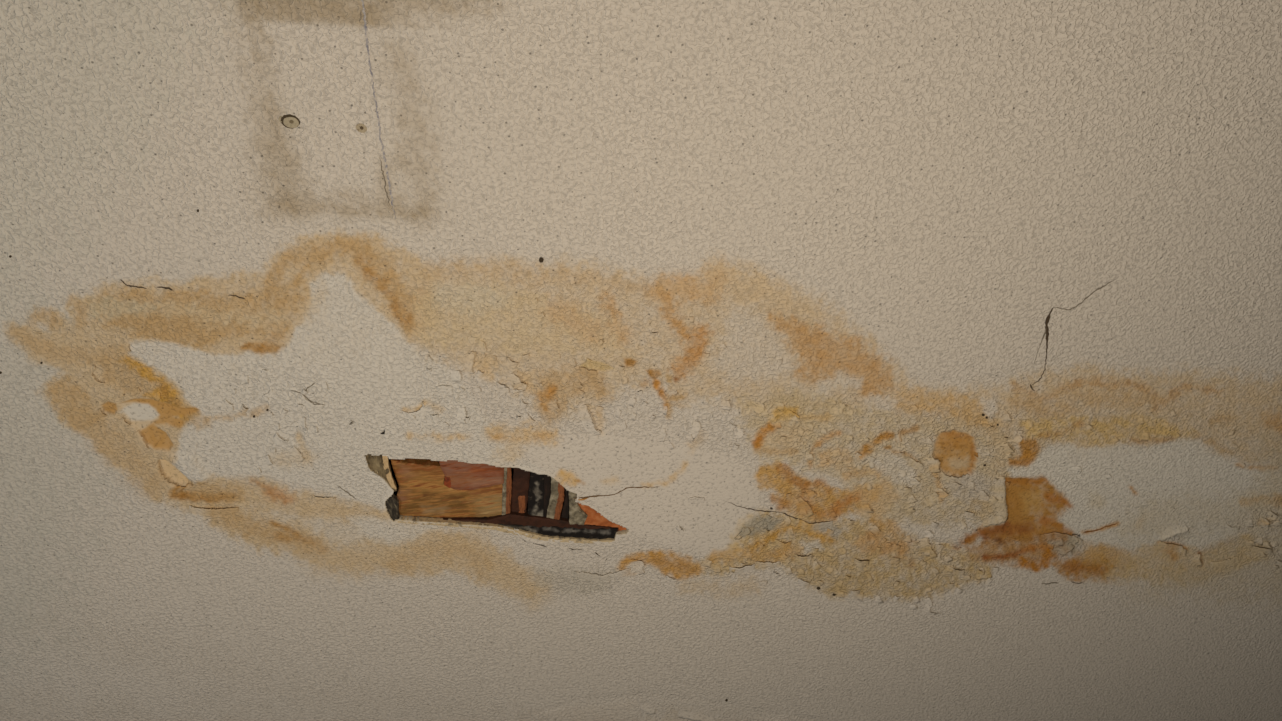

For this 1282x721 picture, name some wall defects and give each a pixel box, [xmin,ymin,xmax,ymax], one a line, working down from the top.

damp [1,221,1282,609]
peeling [100,269,1282,615]
crack [1030,279,1116,391]